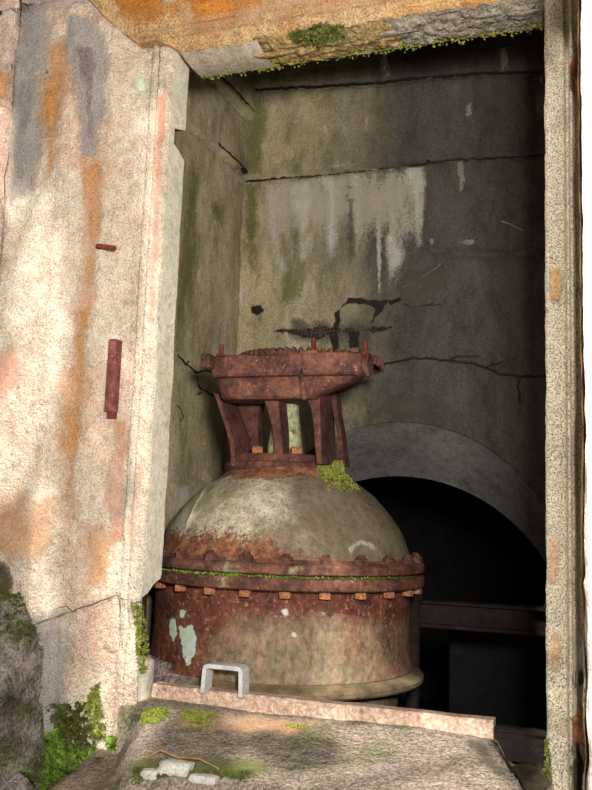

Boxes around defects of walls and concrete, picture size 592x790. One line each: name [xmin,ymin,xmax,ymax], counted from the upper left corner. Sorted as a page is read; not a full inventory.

rust [117,0,351,35]
damp [7,4,50,199]
rust [39,38,73,170]
damp [67,14,109,156]
rust [151,99,165,282]
damp [265,165,423,268]
crack [178,330,214,397]
crack [239,298,440,350]
crack [384,355,546,404]
rust [575,0,586,620]
crack [32,595,128,626]
rust [549,539,559,582]